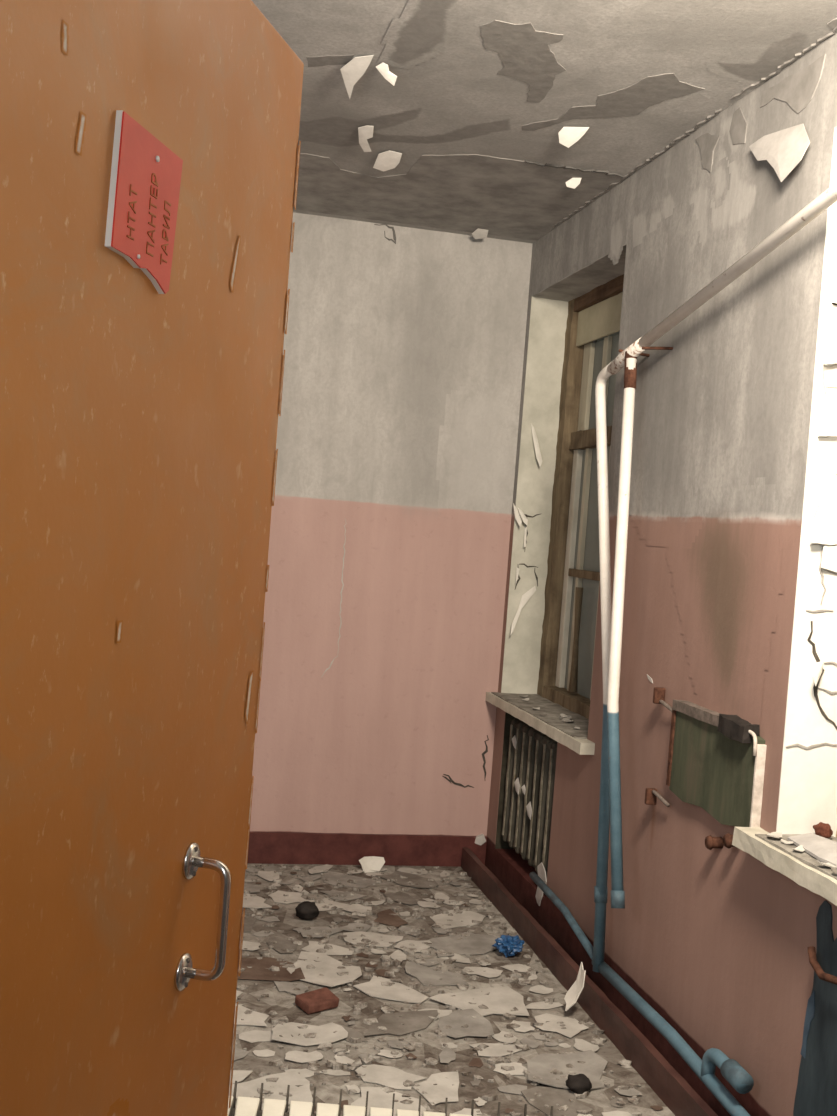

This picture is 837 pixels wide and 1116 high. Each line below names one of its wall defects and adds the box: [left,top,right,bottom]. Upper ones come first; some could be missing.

flaking render [306,0,466,99]
flaking render [480,20,566,103]
flaking render [291,73,705,253]
peeling [608,18,837,265]
peeling [824,329,837,364]
peeling [818,388,837,436]
crack [514,514,540,589]
peeling [811,475,837,572]
crack [786,543,837,749]
crack [443,735,489,788]
peeling [793,900,837,1116]